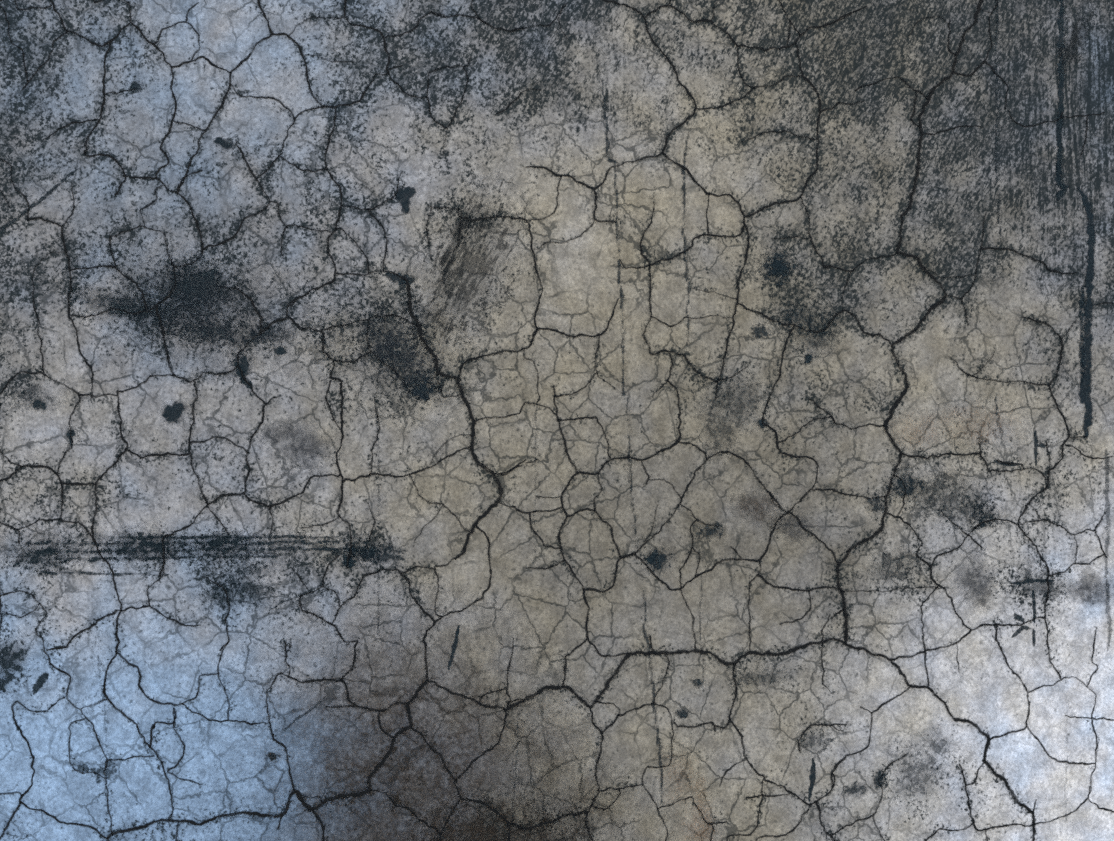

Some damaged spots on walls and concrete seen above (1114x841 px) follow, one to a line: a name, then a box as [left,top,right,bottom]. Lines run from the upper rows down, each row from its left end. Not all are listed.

leakage [0,635,49,693]
leakage [74,257,289,389]
crack [0,0,471,841]
crack [393,0,569,40]
crack [494,89,540,117]
crack [299,171,907,841]
crack [526,0,1114,841]
leakage [1054,2,1096,438]